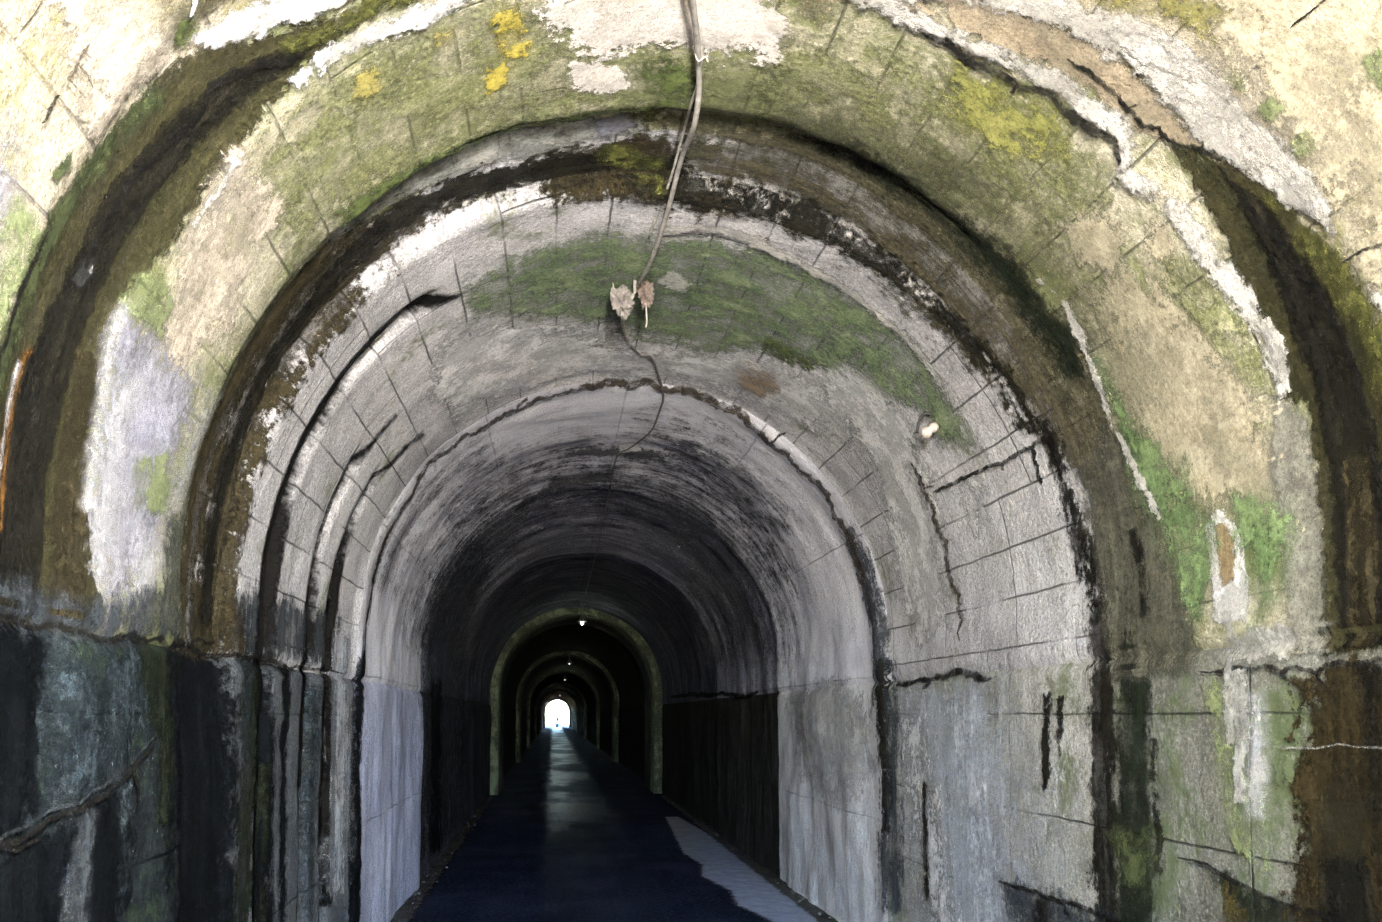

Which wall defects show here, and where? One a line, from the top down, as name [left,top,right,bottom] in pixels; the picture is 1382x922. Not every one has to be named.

peeling [531,0,793,97]
peeling [902,0,1211,153]
crack [1290,0,1325,28]
corrosion [0,349,32,531]
damp [251,312,399,659]
damp [403,293,461,312]
damp [297,414,592,922]
crack [368,378,874,645]
damp [425,313,954,647]
crack [896,436,1063,689]
damp [852,0,1382,804]
crack [917,29,1382,519]